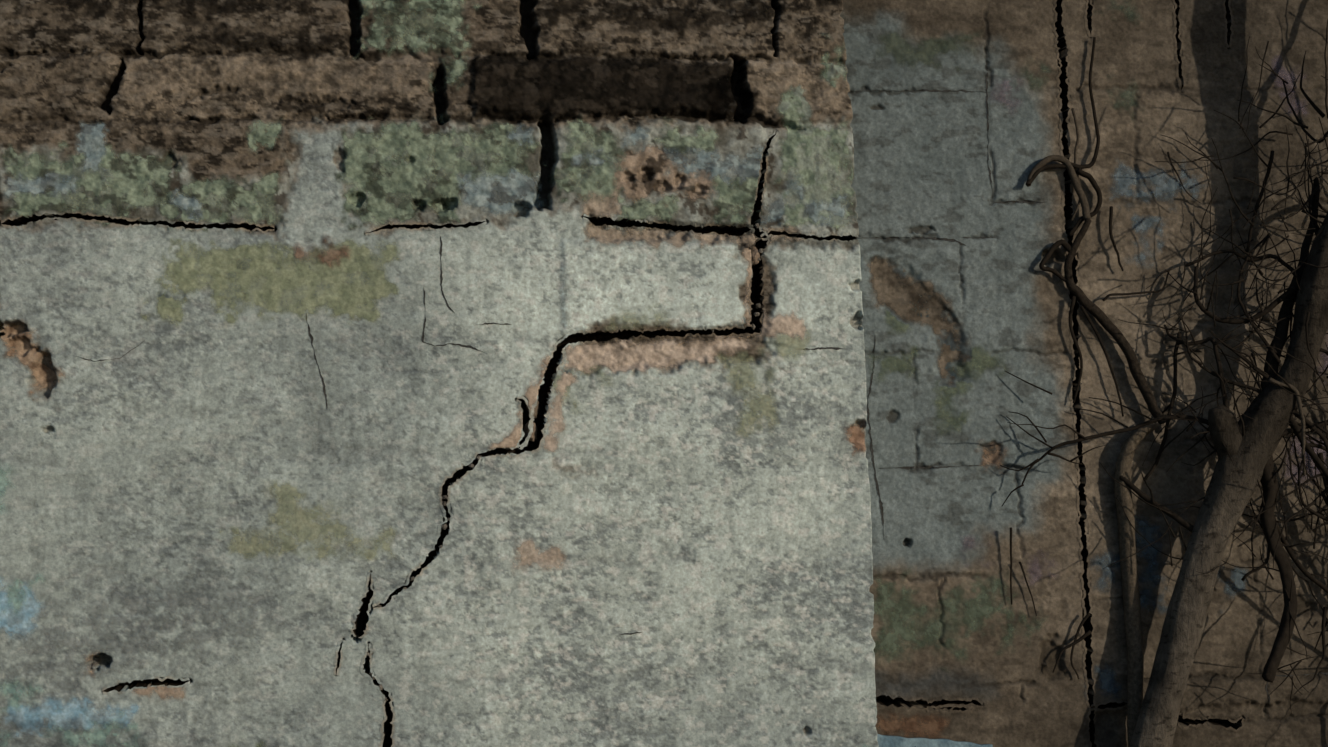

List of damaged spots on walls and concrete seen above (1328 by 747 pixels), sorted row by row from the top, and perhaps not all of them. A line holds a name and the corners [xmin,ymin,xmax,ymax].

crack [1,210,276,234]
spalling [582,146,814,283]
spalling [0,323,63,394]
spalling [491,300,806,451]
crack [333,129,996,747]
spalling [868,256,970,384]
crack [850,0,1127,747]
crack [102,675,191,696]